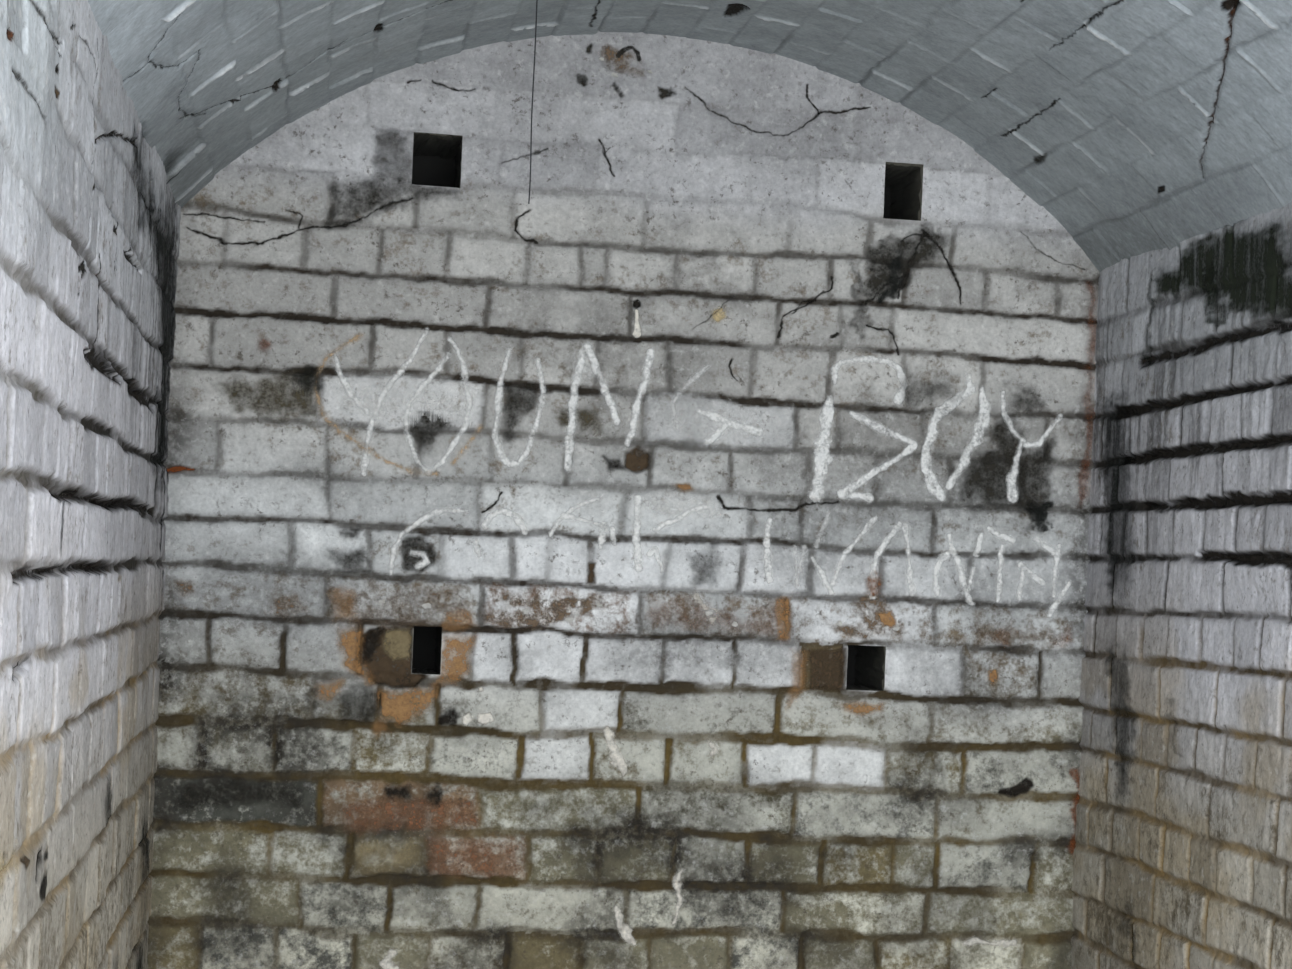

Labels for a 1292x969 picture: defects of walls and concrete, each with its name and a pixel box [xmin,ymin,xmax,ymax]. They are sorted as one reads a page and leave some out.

crack [1053,0,1124,47]
crack [12,69,43,116]
crack [685,84,870,136]
crack [1001,98,1061,136]
crack [1200,0,1238,168]
crack [31,0,344,346]
crack [184,198,413,245]
water stain [851,253,902,326]
water stain [1146,225,1292,364]
water stain [131,137,175,549]
crack [716,495,839,512]
water stain [180,781,299,809]